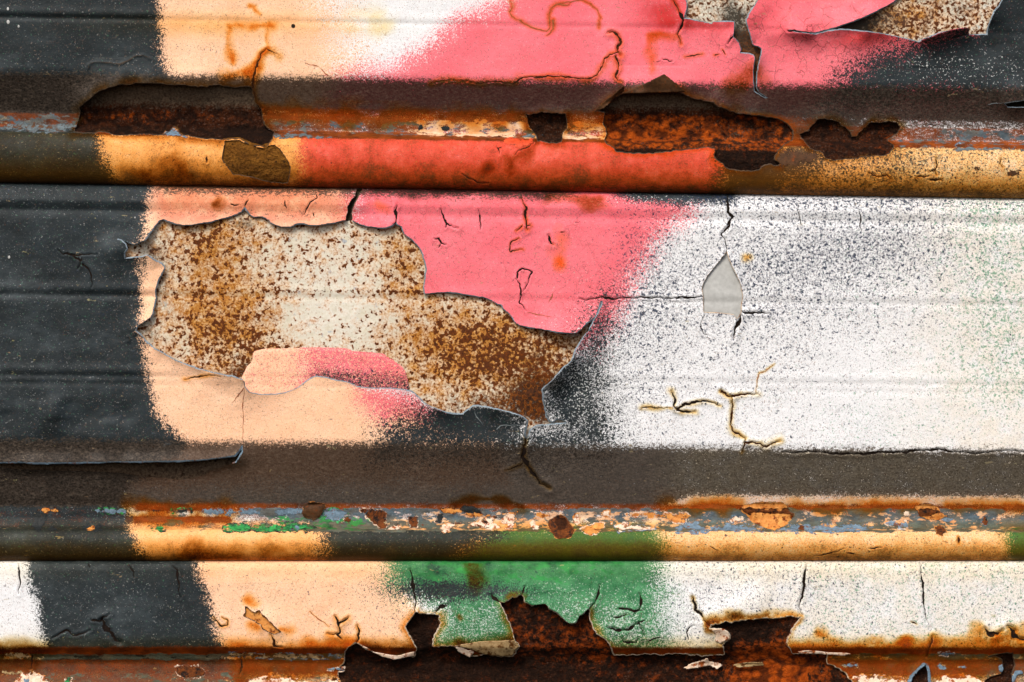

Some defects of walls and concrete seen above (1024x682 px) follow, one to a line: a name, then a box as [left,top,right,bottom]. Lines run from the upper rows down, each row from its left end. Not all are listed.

crack [431,0,622,84]
spalling [0,79,340,183]
spalling [594,74,906,172]
crack [721,195,734,252]
peeling [117,189,603,438]
crack [642,367,1023,455]
rust [547,514,577,539]
rust [694,501,805,532]
rust [905,503,951,536]
crack [799,547,878,614]
spalling [229,589,1023,682]
rust [793,631,958,676]